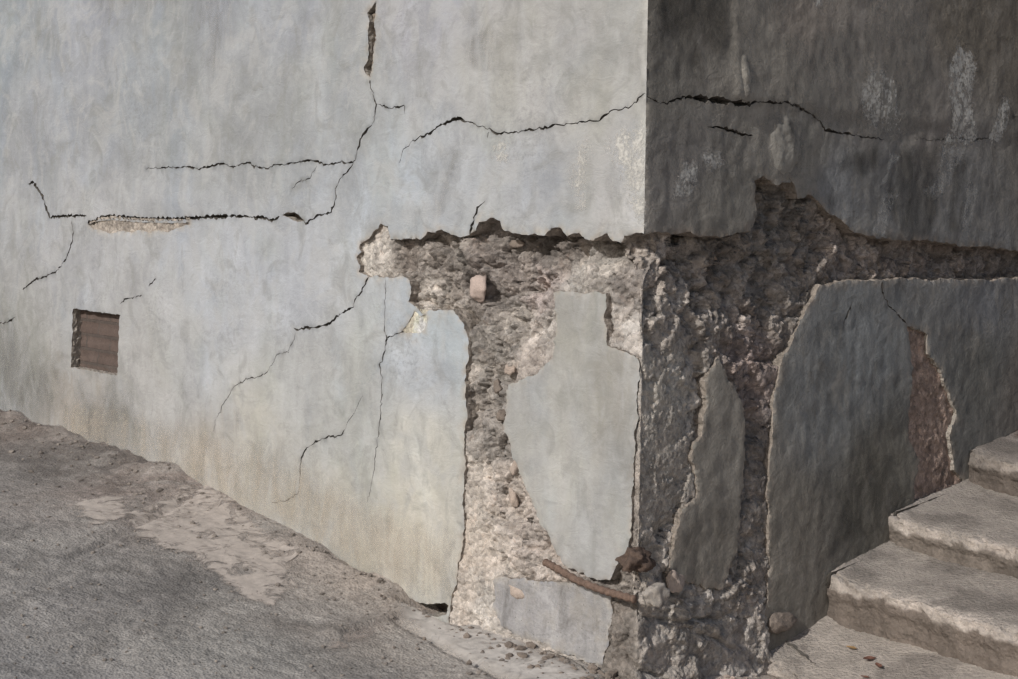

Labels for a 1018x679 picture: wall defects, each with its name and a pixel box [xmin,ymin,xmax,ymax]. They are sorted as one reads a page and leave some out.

crack [23,180,280,290]
crack [147,81,405,225]
crack [469,202,484,234]
crack [400,93,883,161]
leakage [676,154,722,196]
leakage [944,45,977,154]
leakage [989,97,1010,142]
crack [213,278,404,503]
spalling [357,176,1018,679]